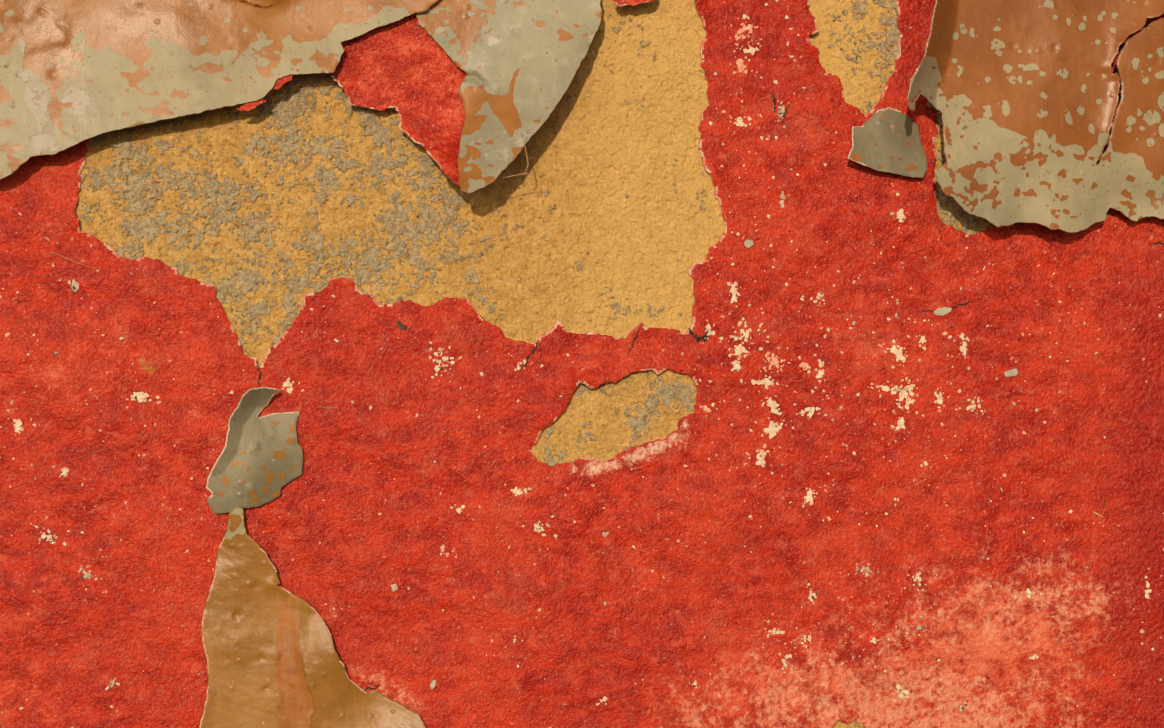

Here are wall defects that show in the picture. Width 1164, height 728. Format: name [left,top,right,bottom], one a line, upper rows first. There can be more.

spalling [0,0,824,476]
peeling [808,0,1164,235]
peeling [199,376,426,728]